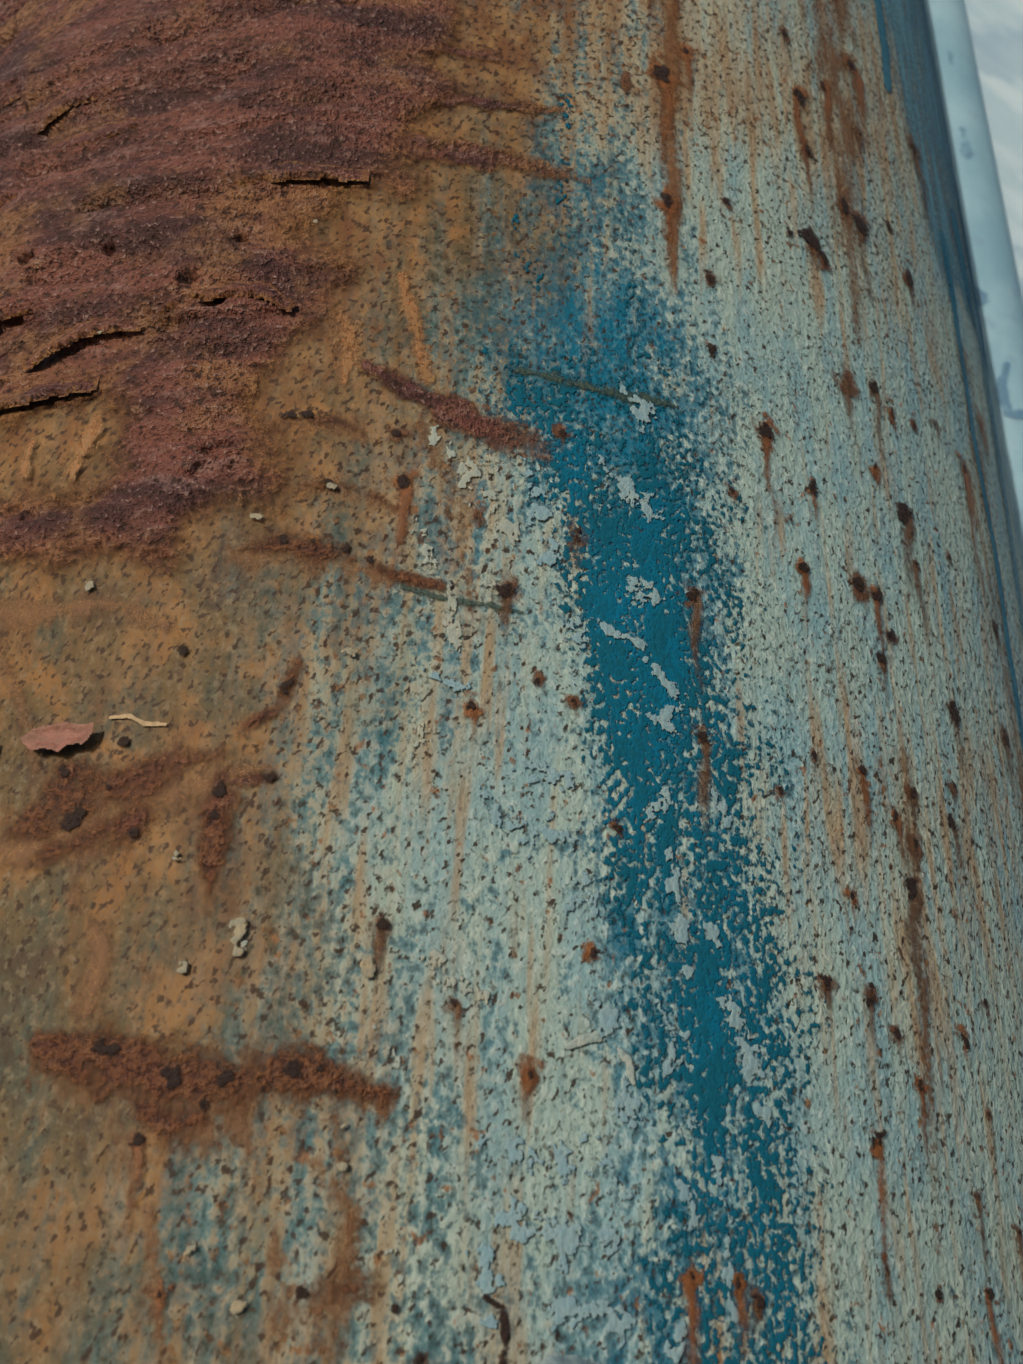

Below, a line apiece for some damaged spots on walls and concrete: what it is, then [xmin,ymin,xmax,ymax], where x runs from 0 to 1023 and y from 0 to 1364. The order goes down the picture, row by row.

rust [619,0,698,289]
rust [786,0,870,345]
rust [0,0,570,574]
rust [755,411,780,497]
rust [832,370,940,435]
peeling [409,518,465,652]
rust [851,571,899,684]
rust [897,501,926,629]
peeling [417,205,857,1364]
rust [887,750,937,1150]
rust [27,1024,395,1227]
peeling [387,1046,406,1076]